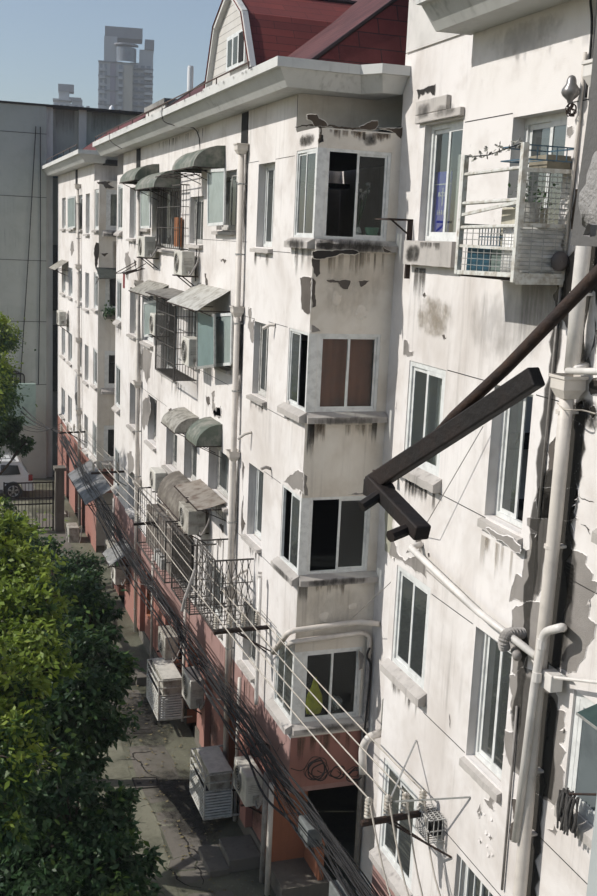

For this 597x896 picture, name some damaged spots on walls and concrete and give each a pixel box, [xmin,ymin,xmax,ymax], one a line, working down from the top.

leakage [317,240,381,253]
peeling [570,188,578,230]
spalling [583,223,597,237]
peeling [300,249,369,333]
peeling [552,250,575,307]
leakage [419,303,446,332]
peeling [575,377,597,419]
peeling [284,470,309,496]
peeling [558,484,597,673]
peeling [485,436,556,776]